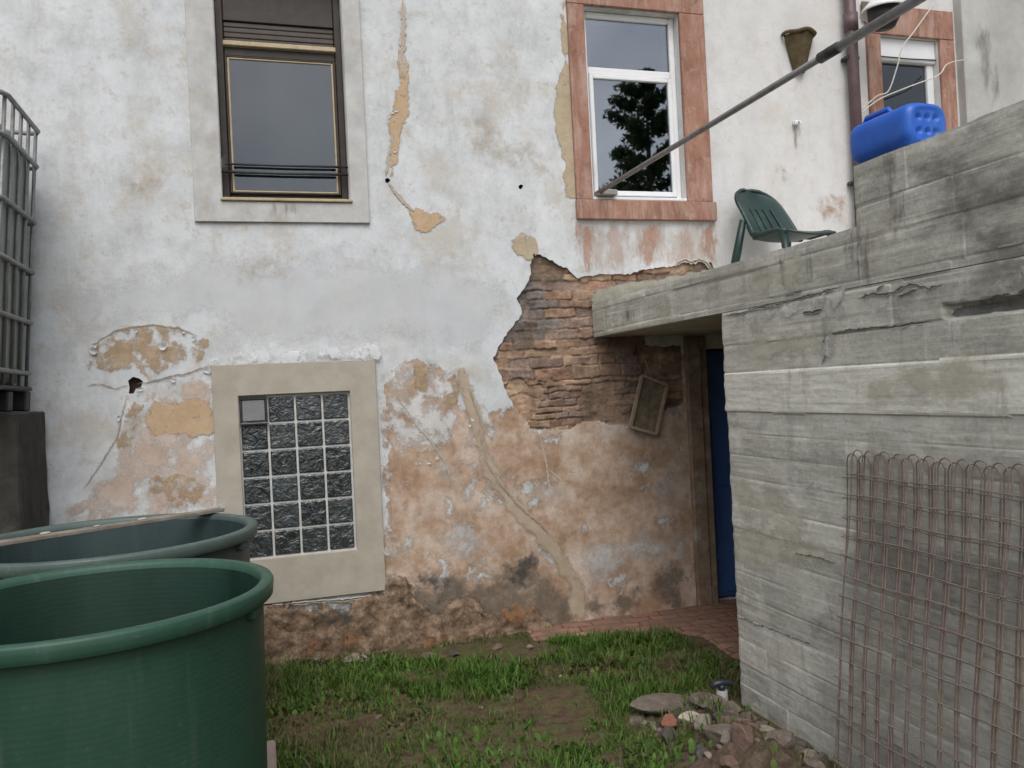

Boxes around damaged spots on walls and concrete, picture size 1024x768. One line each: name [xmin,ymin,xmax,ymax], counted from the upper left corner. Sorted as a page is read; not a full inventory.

peeling [385,0,446,233]
peeling [553,2,576,198]
crack [724,282,943,365]
peeling [69,324,216,520]
peeling [264,232,714,667]
crack [470,392,565,533]
damp [413,552,572,625]